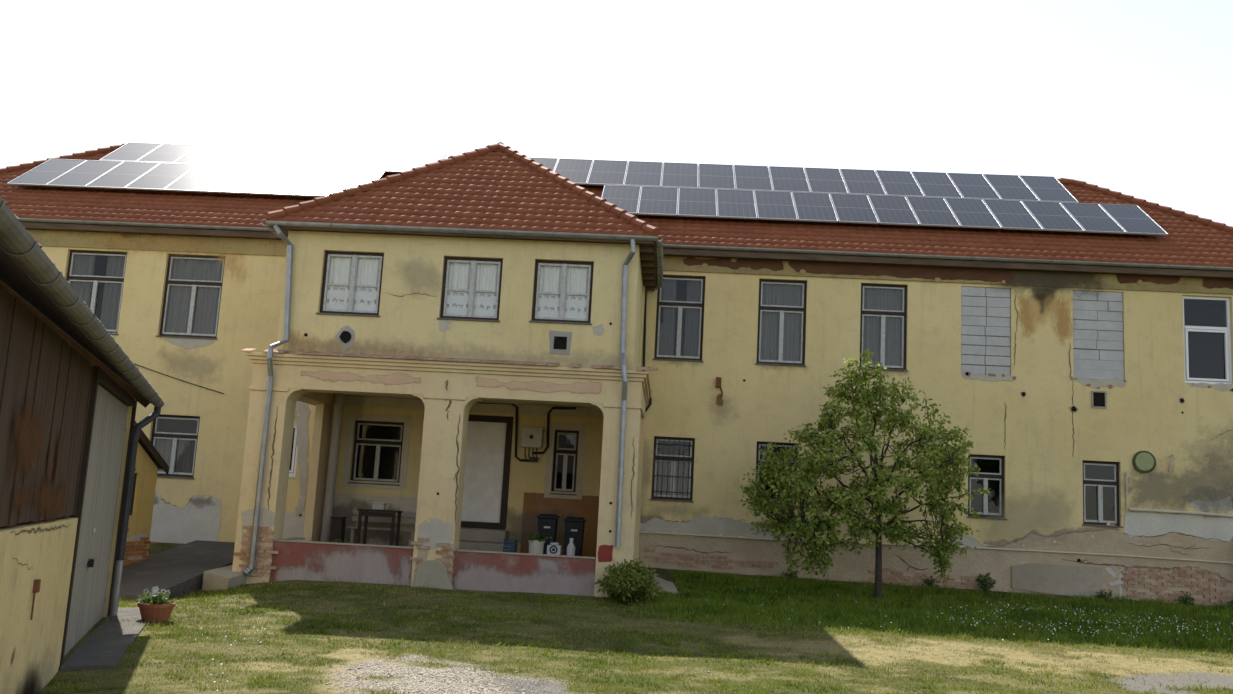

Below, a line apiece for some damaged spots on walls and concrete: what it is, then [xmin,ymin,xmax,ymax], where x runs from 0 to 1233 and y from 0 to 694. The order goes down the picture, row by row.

crack [1068,346,1076,456]
flaking render [123,491,221,566]
flaking render [233,401,310,577]
flaking render [410,517,455,582]
flaking render [638,514,1233,608]